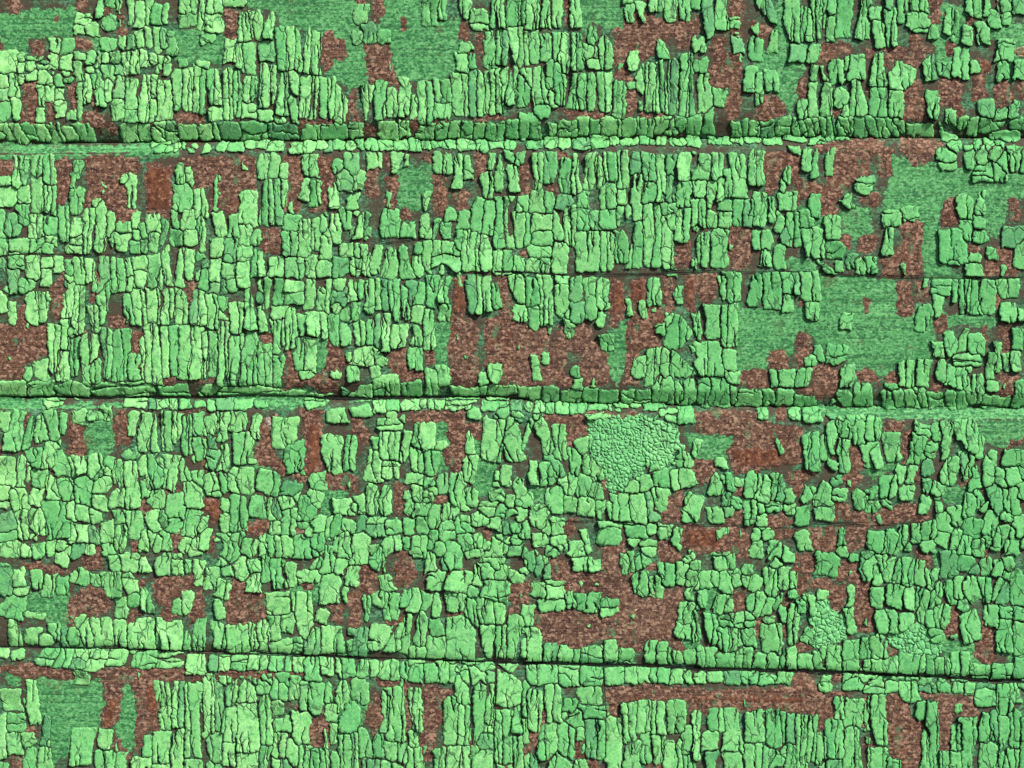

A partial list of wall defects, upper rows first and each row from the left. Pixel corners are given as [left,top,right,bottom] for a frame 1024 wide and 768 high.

peeling [0,81,257,224]
crack [0,0,878,388]
crack [707,52,934,146]
peeling [707,0,1024,122]
crack [854,0,1024,83]
peeling [0,271,65,381]
peeling [387,240,719,388]
peeling [732,135,1024,652]
crack [880,190,1024,411]
crack [0,247,903,768]
peeling [508,522,701,654]
crack [619,416,1024,768]